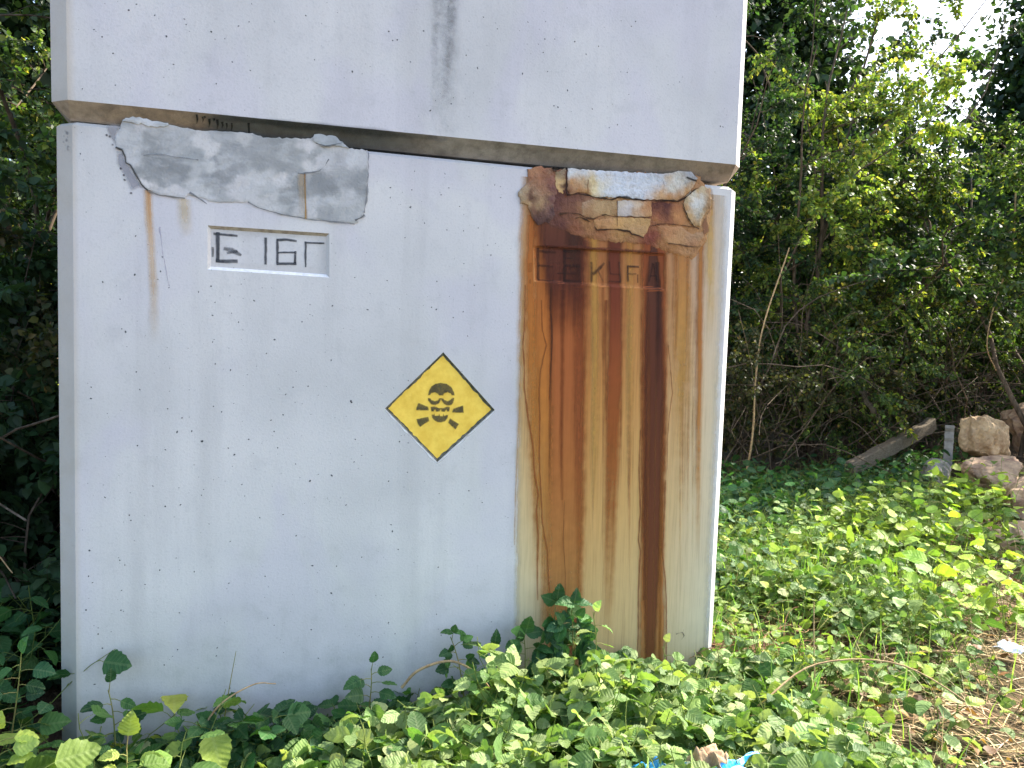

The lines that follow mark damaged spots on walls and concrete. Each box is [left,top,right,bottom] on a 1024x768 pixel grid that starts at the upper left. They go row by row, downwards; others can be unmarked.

corrosion [145,190,154,287]
spalling [518,166,713,260]
corrosion [514,194,724,670]